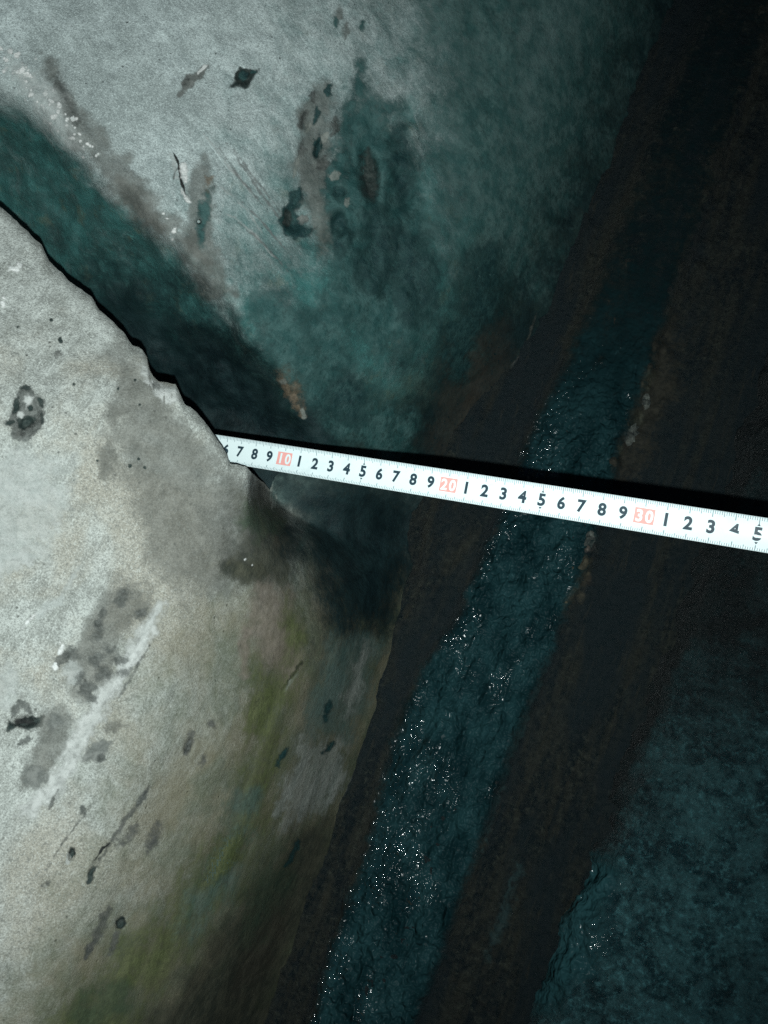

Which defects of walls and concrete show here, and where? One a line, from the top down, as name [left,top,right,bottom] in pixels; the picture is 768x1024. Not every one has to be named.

peeling [177,65,209,97]
spalling [230,67,257,89]
crack [173,154,191,203]
spalling [278,187,313,240]
leakage [88,0,674,468]
leakage [111,612,158,691]
spalling [6,700,63,745]
peeling [24,766,49,789]
leakage [147,824,329,1024]